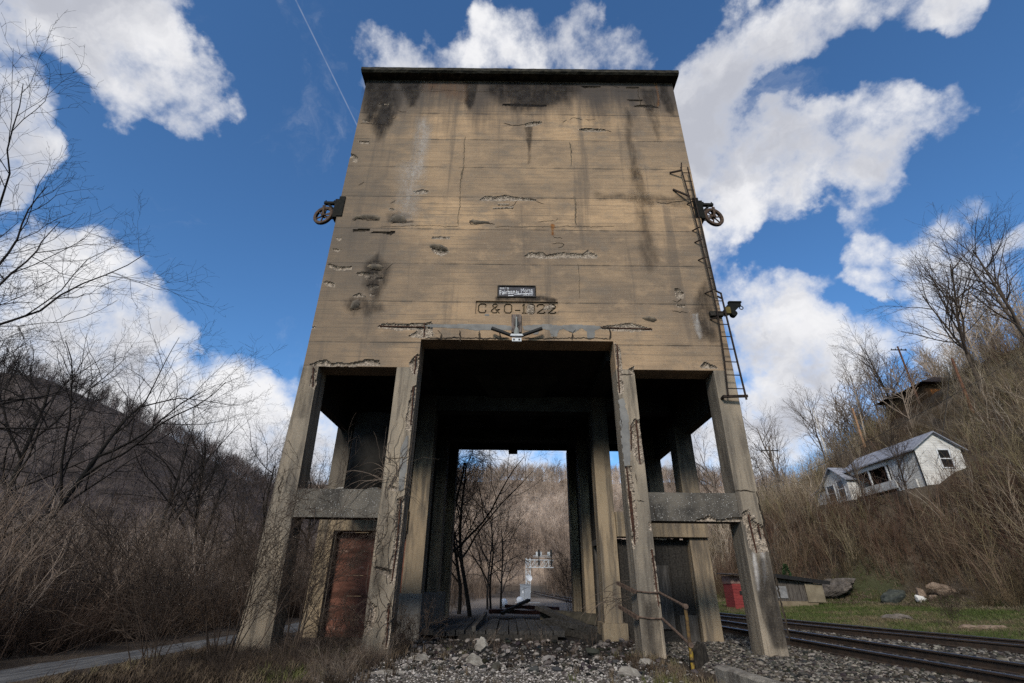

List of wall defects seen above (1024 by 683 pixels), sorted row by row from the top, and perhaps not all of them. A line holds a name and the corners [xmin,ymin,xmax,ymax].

leakage [365,80,420,135]
leakage [465,82,573,109]
crack [383,139,612,248]
spalling [479,195,543,209]
spalling [524,250,598,259]
spalling [377,321,434,338]
spalling [309,359,380,390]
spalling [600,323,653,395]